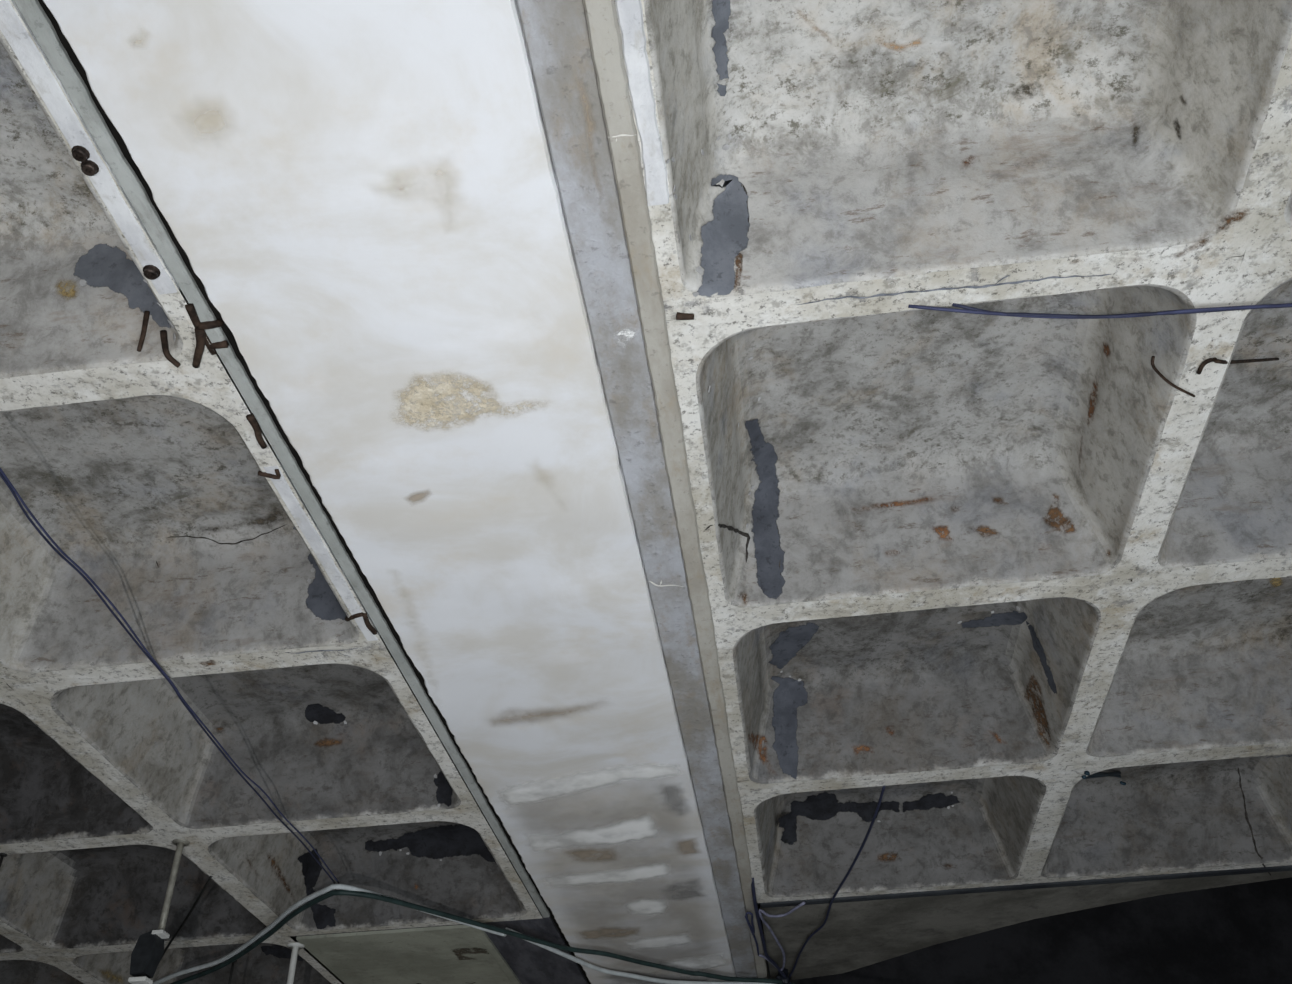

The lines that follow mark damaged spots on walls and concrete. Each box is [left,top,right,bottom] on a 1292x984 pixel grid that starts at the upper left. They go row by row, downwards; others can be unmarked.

peeling [689,174,750,297]
peeling [73,244,176,341]
leakage [399,375,534,428]
peeling [738,419,785,599]
rust [1045,495,1075,533]
peeling [306,553,347,621]
peeling [768,622,819,779]
rust [1024,675,1051,745]
peeling [365,824,496,863]
leakage [679,840,696,854]
peeling [776,792,960,845]
peeling [298,849,336,929]